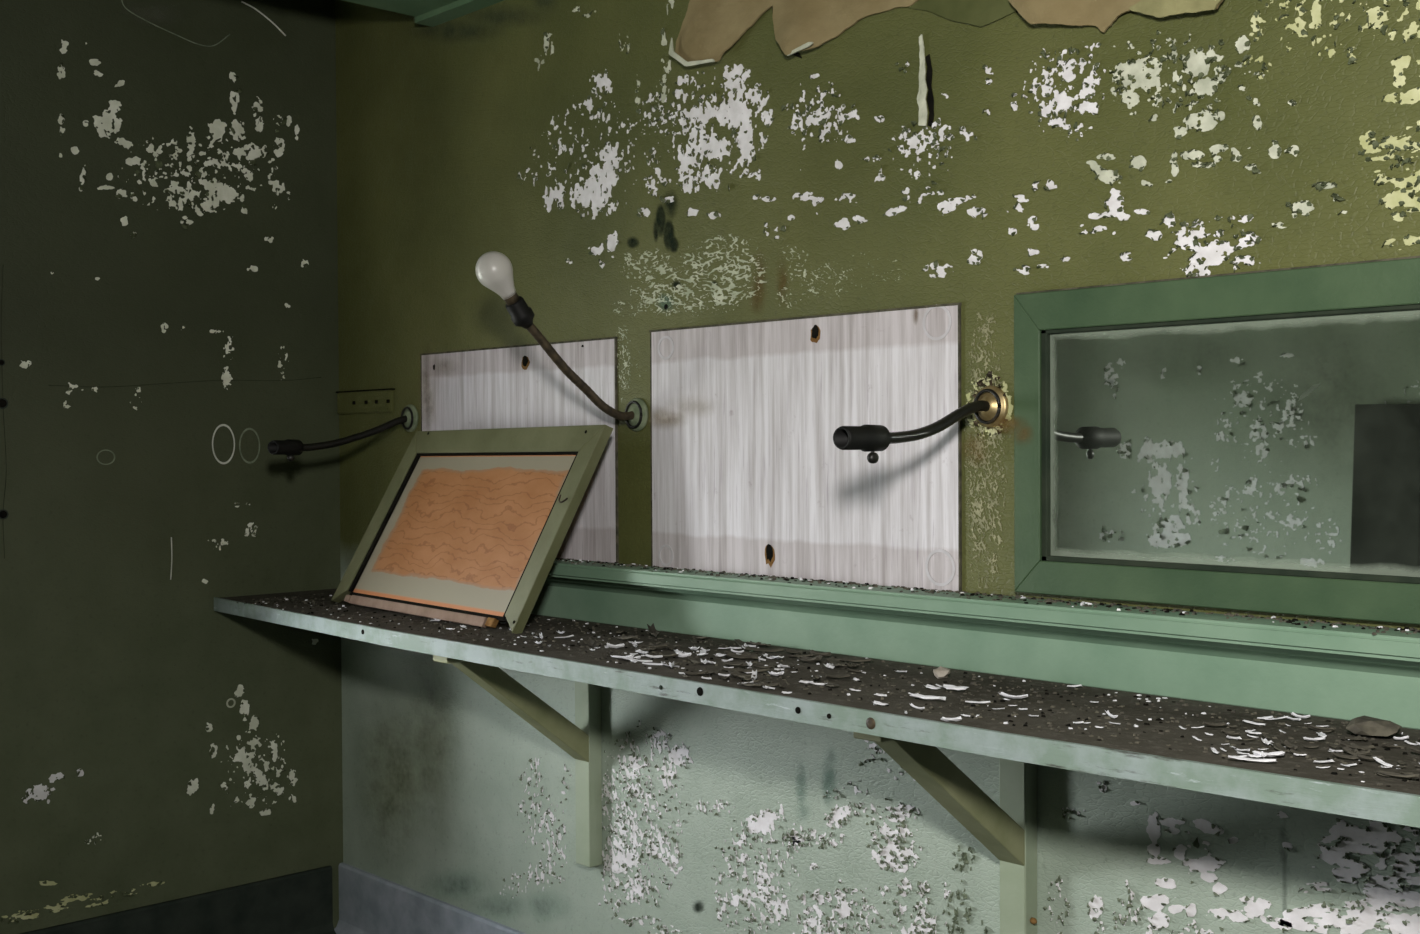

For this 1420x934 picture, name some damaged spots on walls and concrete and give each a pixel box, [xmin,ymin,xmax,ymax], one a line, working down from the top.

peeling [57,40,300,239]
peeling [517,0,987,239]
peeling [1007,0,1420,277]
peeling [588,231,619,269]
peeling [922,249,983,278]
peeling [0,880,165,924]
peeling [187,778,200,796]
peeling [205,684,298,816]
peeling [500,757,572,898]
peeling [598,720,988,934]
peeling [1087,801,1420,934]
peeling [1179,712,1420,779]